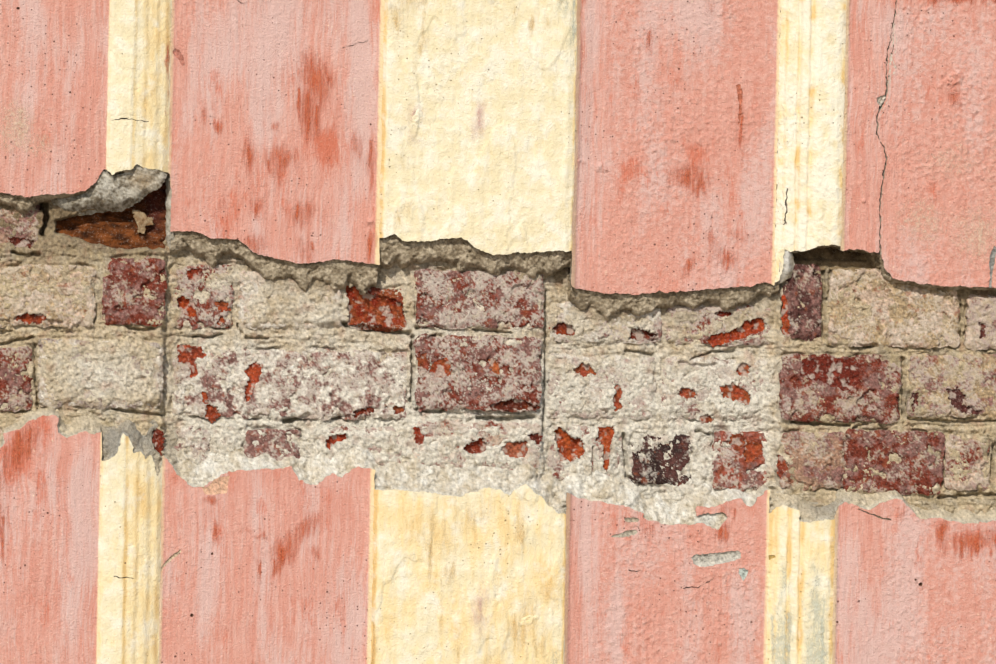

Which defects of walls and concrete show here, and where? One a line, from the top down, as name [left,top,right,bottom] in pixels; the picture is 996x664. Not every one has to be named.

crack [876,2,899,255]
spalling [0,164,996,537]